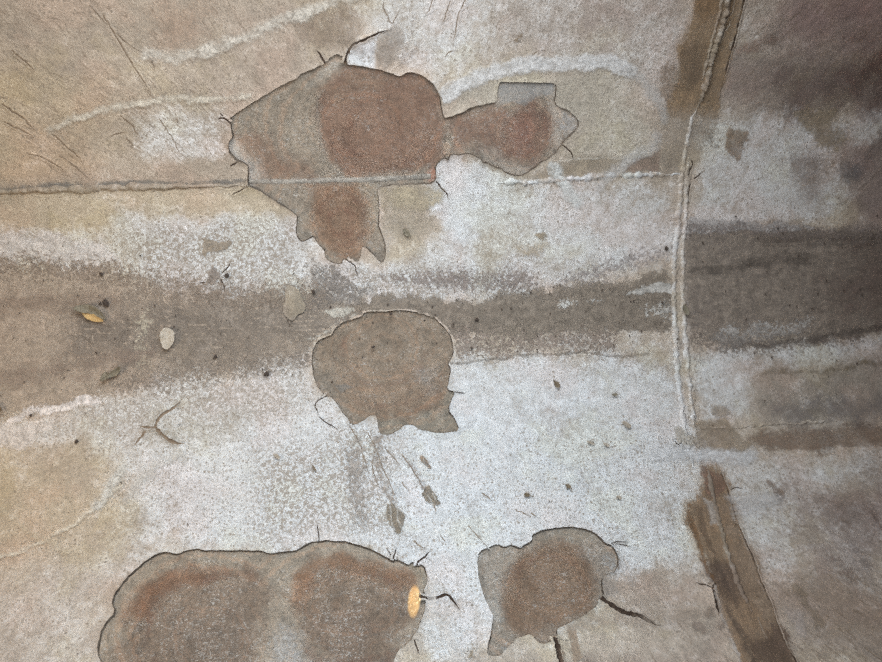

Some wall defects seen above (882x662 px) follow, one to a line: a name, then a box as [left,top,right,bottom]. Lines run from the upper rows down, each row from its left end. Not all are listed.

crack [705,0,748,98]
peeling [228,54,579,264]
crack [685,159,702,206]
damp [686,216,813,234]
peeling [312,310,459,435]
damp [709,315,815,352]
peeling [97,540,427,662]
peeling [477,527,619,656]
crack [696,579,724,615]
crack [718,473,799,662]